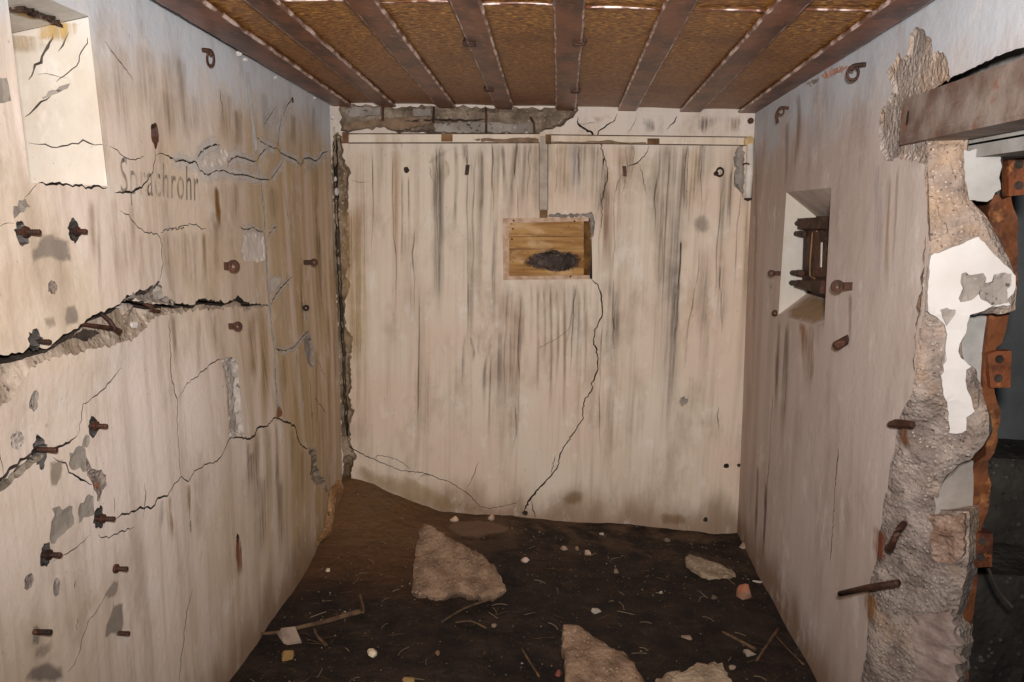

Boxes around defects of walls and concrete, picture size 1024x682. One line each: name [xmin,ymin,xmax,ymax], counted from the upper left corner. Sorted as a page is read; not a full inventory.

crack [9,6,133,117]
spalling [879,27,951,164]
spalling [241,231,265,263]
crack [0,94,603,561]
spalling [331,104,578,477]
peeling [940,272,1012,325]
spalling [221,357,244,438]
spalling [929,513,969,565]